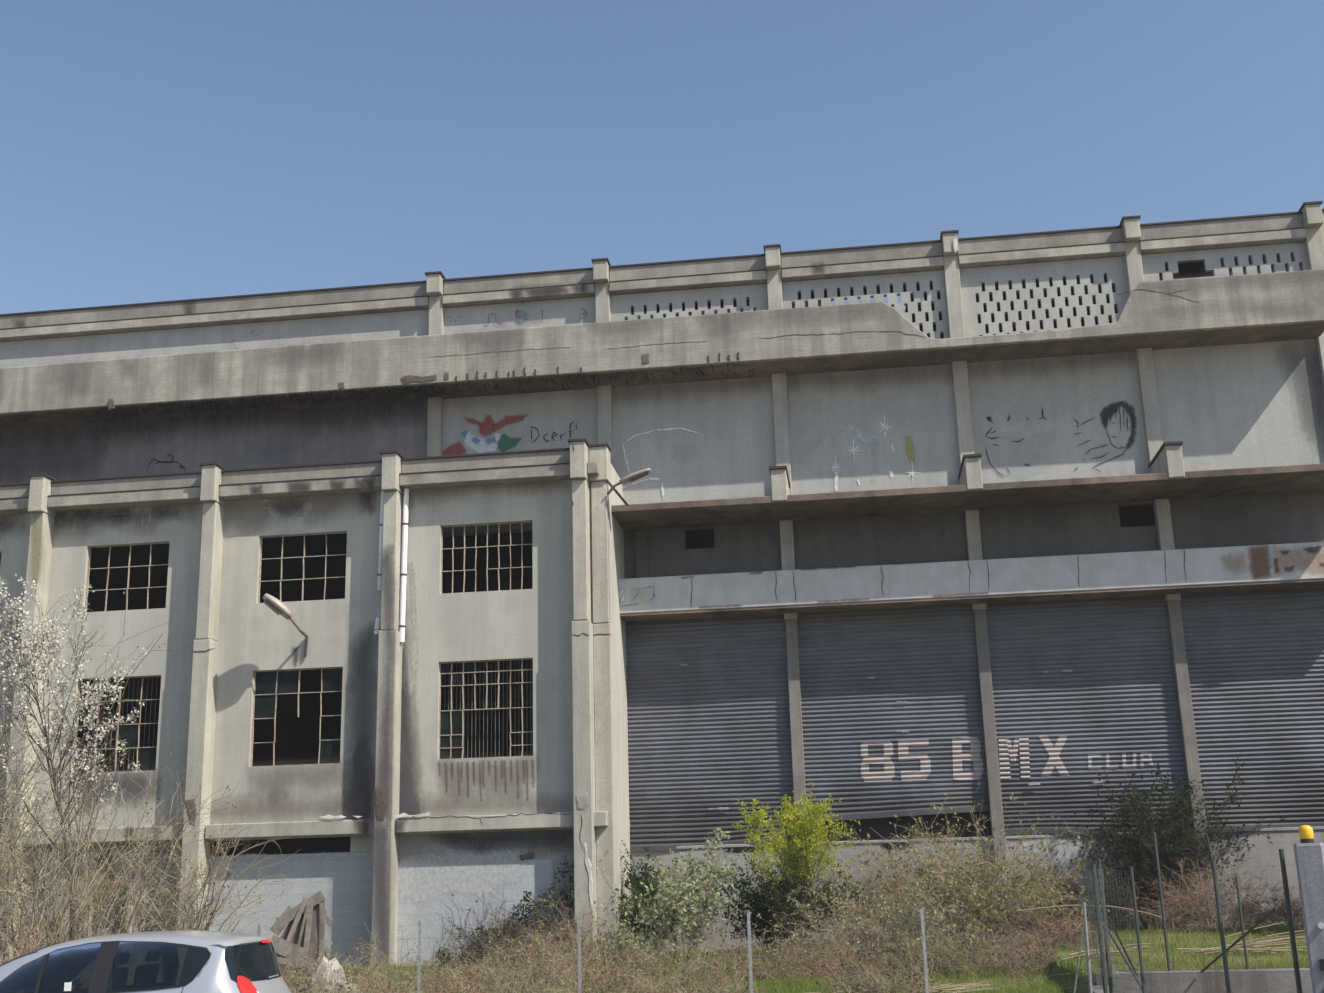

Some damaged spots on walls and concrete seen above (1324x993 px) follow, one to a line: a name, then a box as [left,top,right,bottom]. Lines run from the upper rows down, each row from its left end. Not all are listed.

crack [1118,289,1201,303]
damp [1291,351,1324,429]
damp [349,553,418,961]